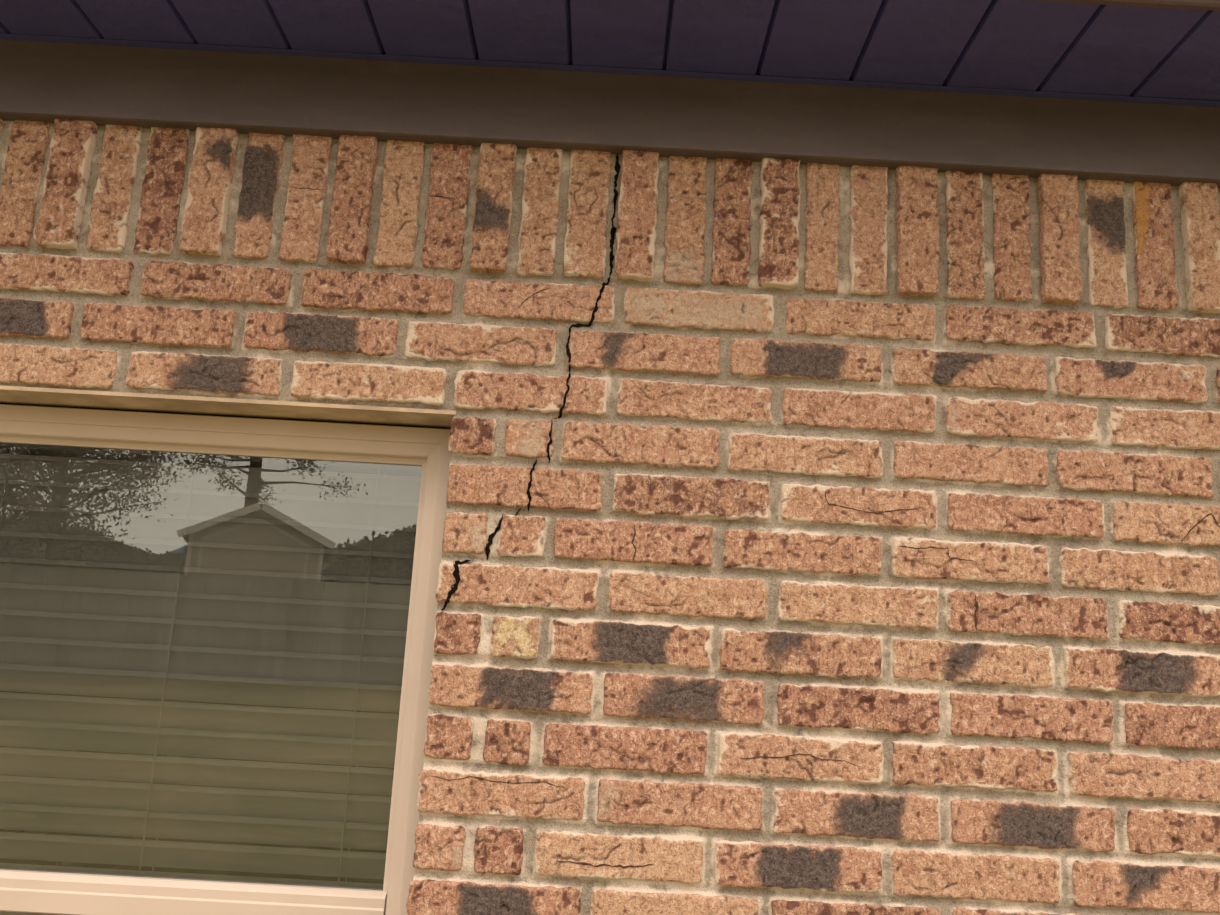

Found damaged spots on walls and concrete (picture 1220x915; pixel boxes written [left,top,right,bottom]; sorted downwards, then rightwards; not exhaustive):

crack [441,154,620,610]